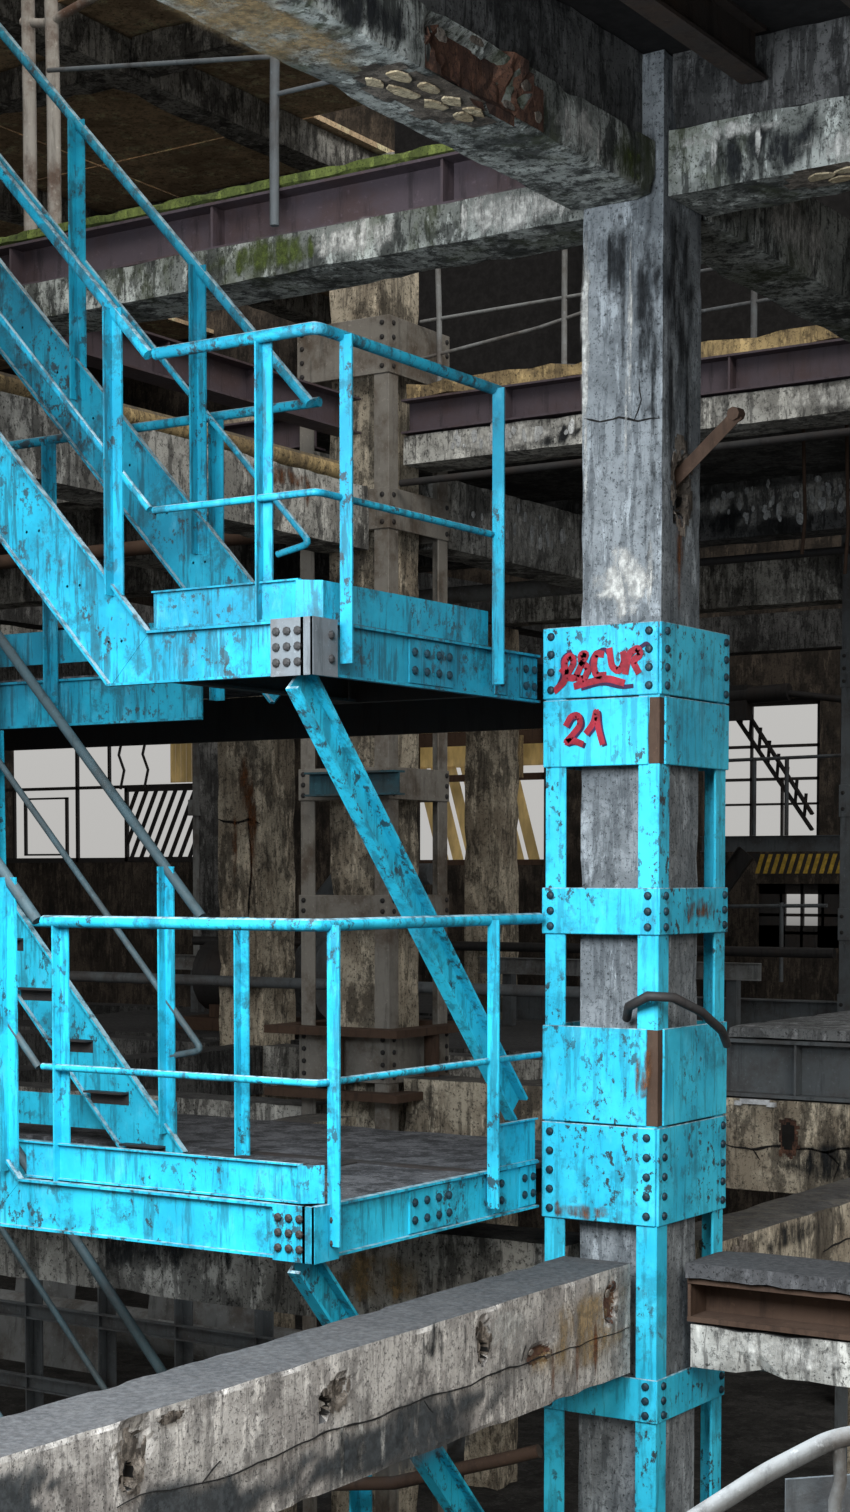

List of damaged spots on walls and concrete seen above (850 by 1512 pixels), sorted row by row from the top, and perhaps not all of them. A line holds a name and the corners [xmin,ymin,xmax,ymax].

water stain [308,221,392,257]
water stain [539,270,589,448]
water stain [607,215,693,455]
spalling [774,1118,800,1159]
crack [726,1144,850,1180]
spalling [117,1409,185,1495]
spalling [319,1376,351,1417]
crack [117,1327,629,1508]